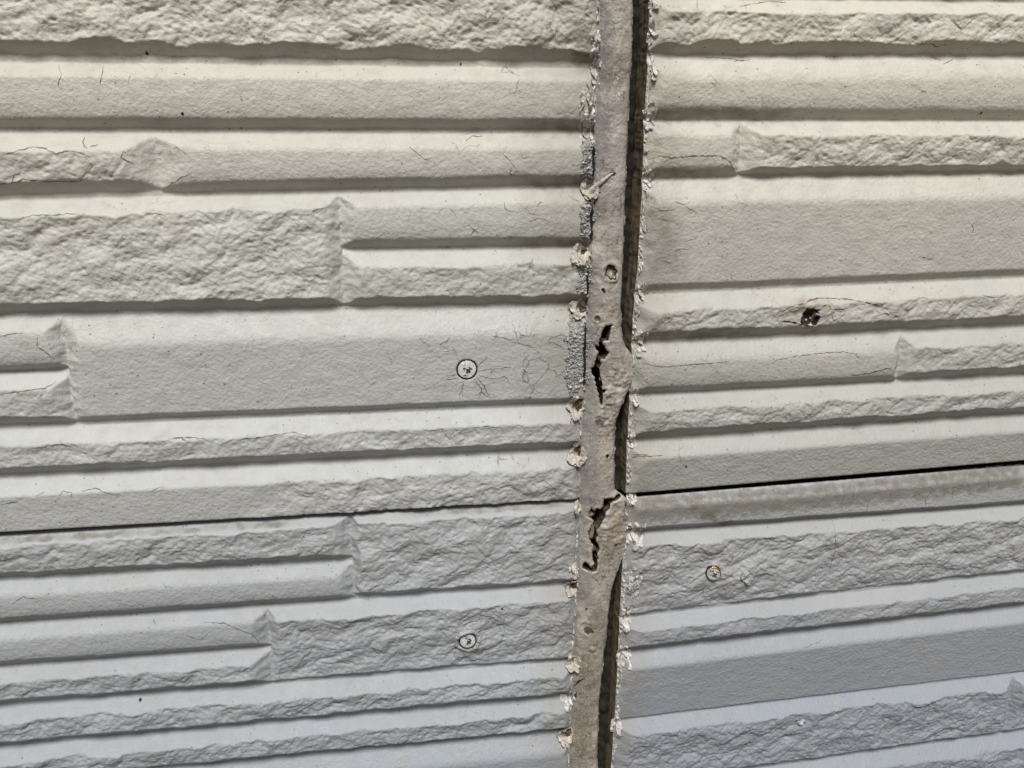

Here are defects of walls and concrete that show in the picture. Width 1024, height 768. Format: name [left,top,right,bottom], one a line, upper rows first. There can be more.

spalling [556,1,616,768]